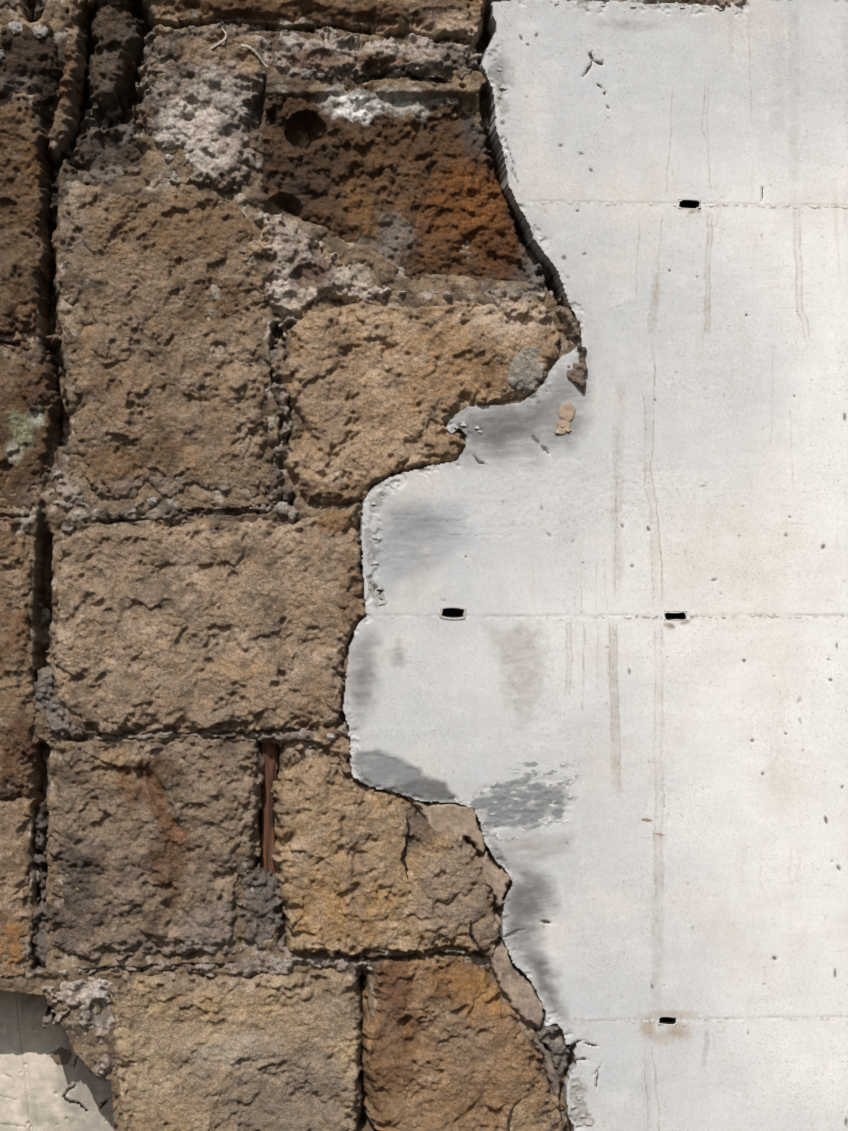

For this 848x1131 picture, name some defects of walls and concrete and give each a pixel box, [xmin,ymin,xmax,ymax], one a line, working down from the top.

spalling [487,63,508,113]
peeling [555,402,575,435]
spalling [93,442,173,481]
spalling [368,491,387,510]
spalling [365,528,386,607]
damp [356,751,456,802]
peeling [407,762,576,908]
damp [511,872,549,989]
peeling [50,1047,71,1065]
peeling [488,937,593,1131]